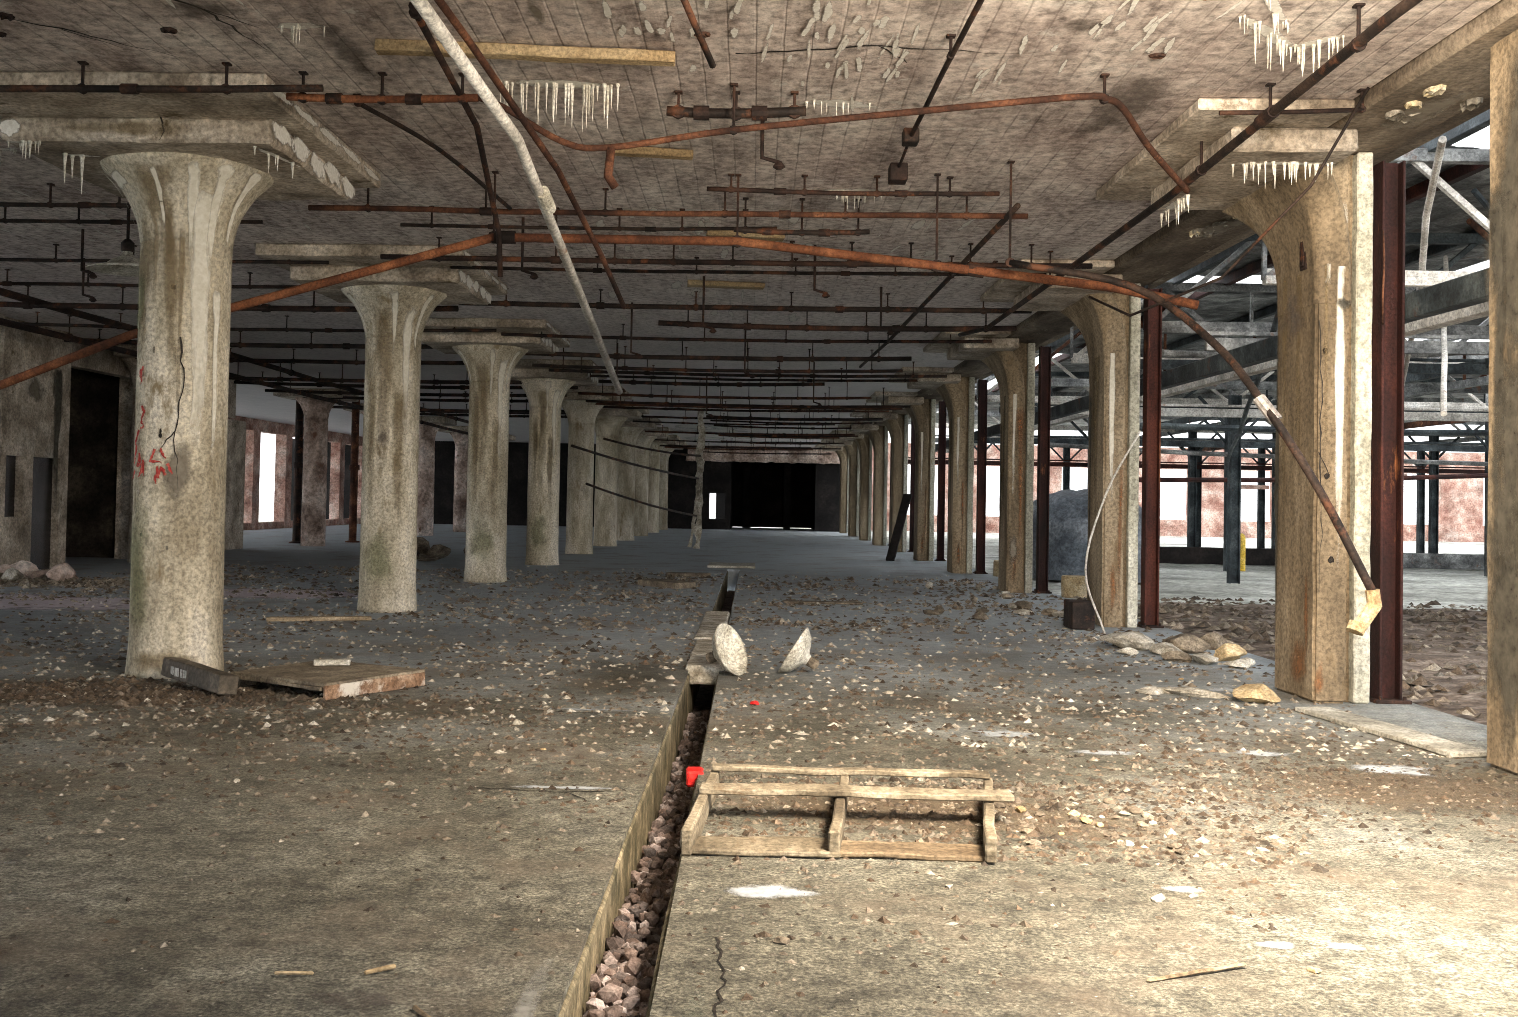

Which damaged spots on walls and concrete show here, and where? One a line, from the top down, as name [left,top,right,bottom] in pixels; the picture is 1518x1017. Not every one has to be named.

efflorescence [500,80,620,132]
water stain [1231,161,1333,185]
crack [713,937,727,1017]